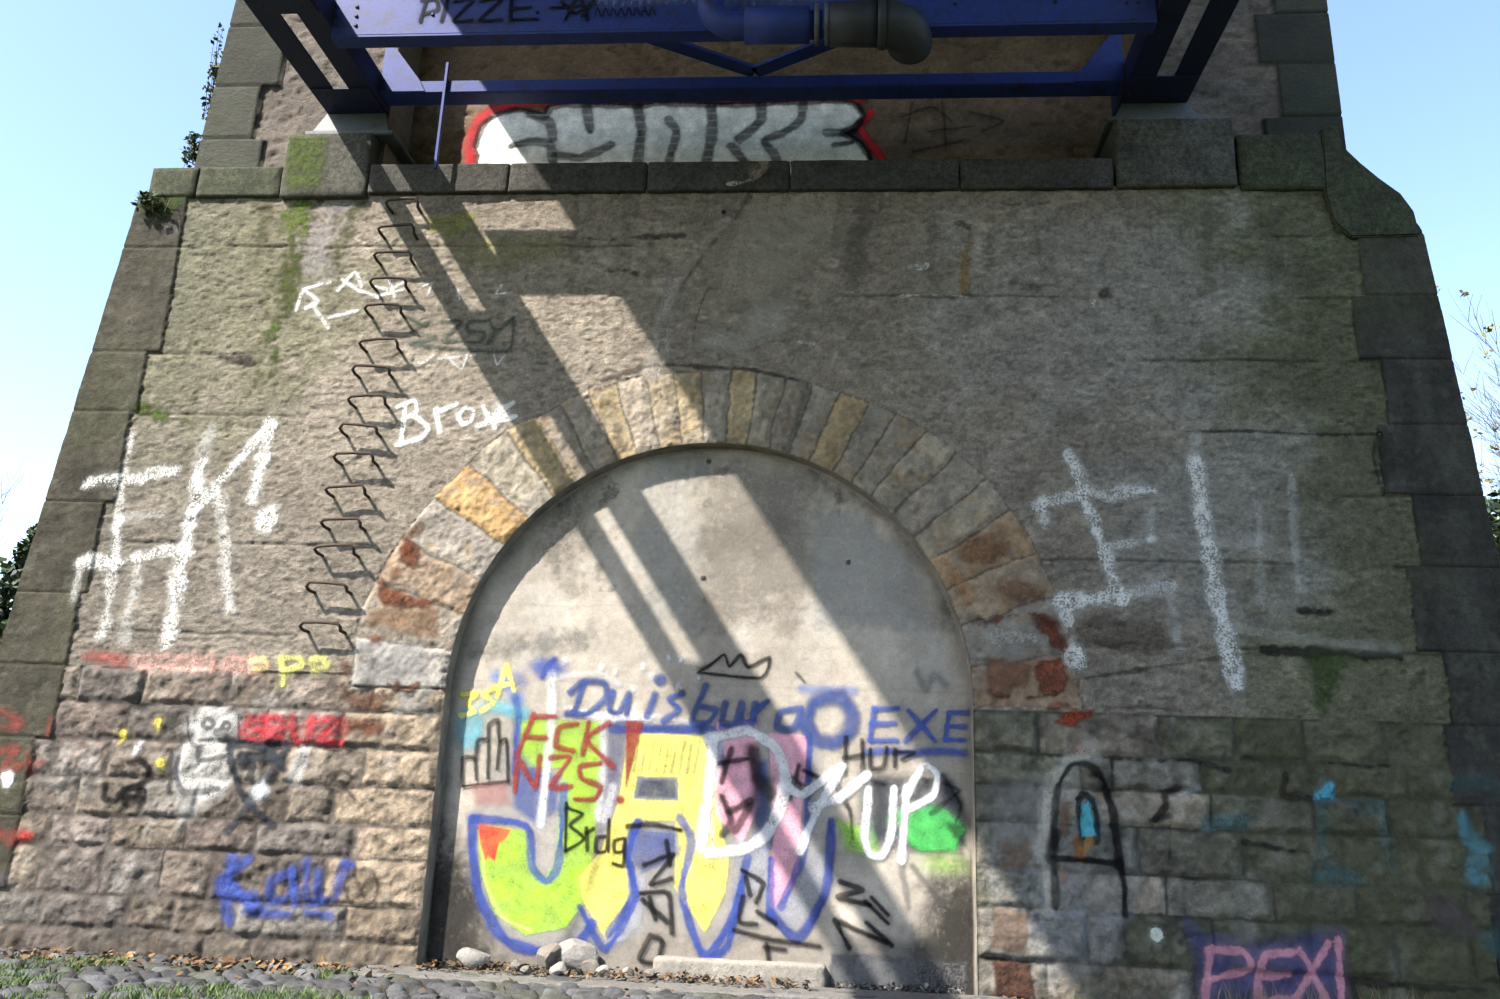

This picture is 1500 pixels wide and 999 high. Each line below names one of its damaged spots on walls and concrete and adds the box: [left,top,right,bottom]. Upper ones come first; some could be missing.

crack [567,161,800,396]